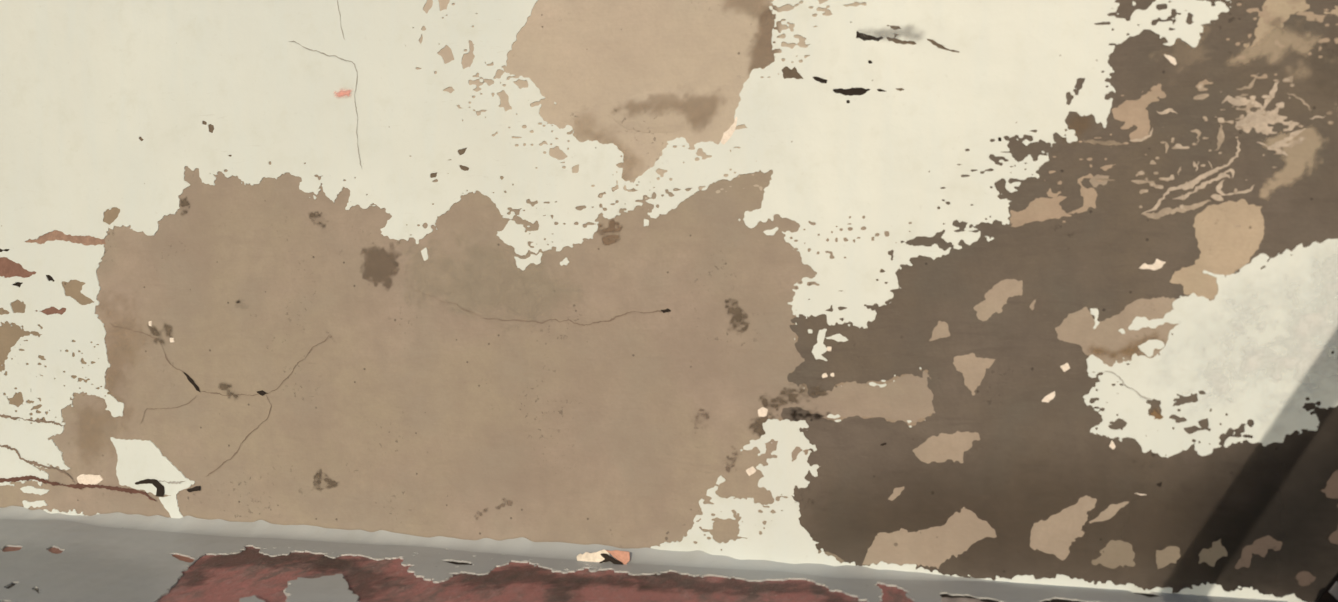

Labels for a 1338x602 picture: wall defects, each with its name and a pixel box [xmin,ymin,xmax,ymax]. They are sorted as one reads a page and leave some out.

peeling [1107,0,1193,30]
crack [289,0,362,167]
peeling [469,0,810,192]
spalling [813,77,904,103]
spalling [0,257,37,287]
crack [410,285,671,326]
peeling [0,300,66,376]
crack [0,323,329,501]
water stain [1216,412,1338,593]
peeling [699,510,747,543]
peeling [284,574,359,602]
peeling [1253,570,1338,602]